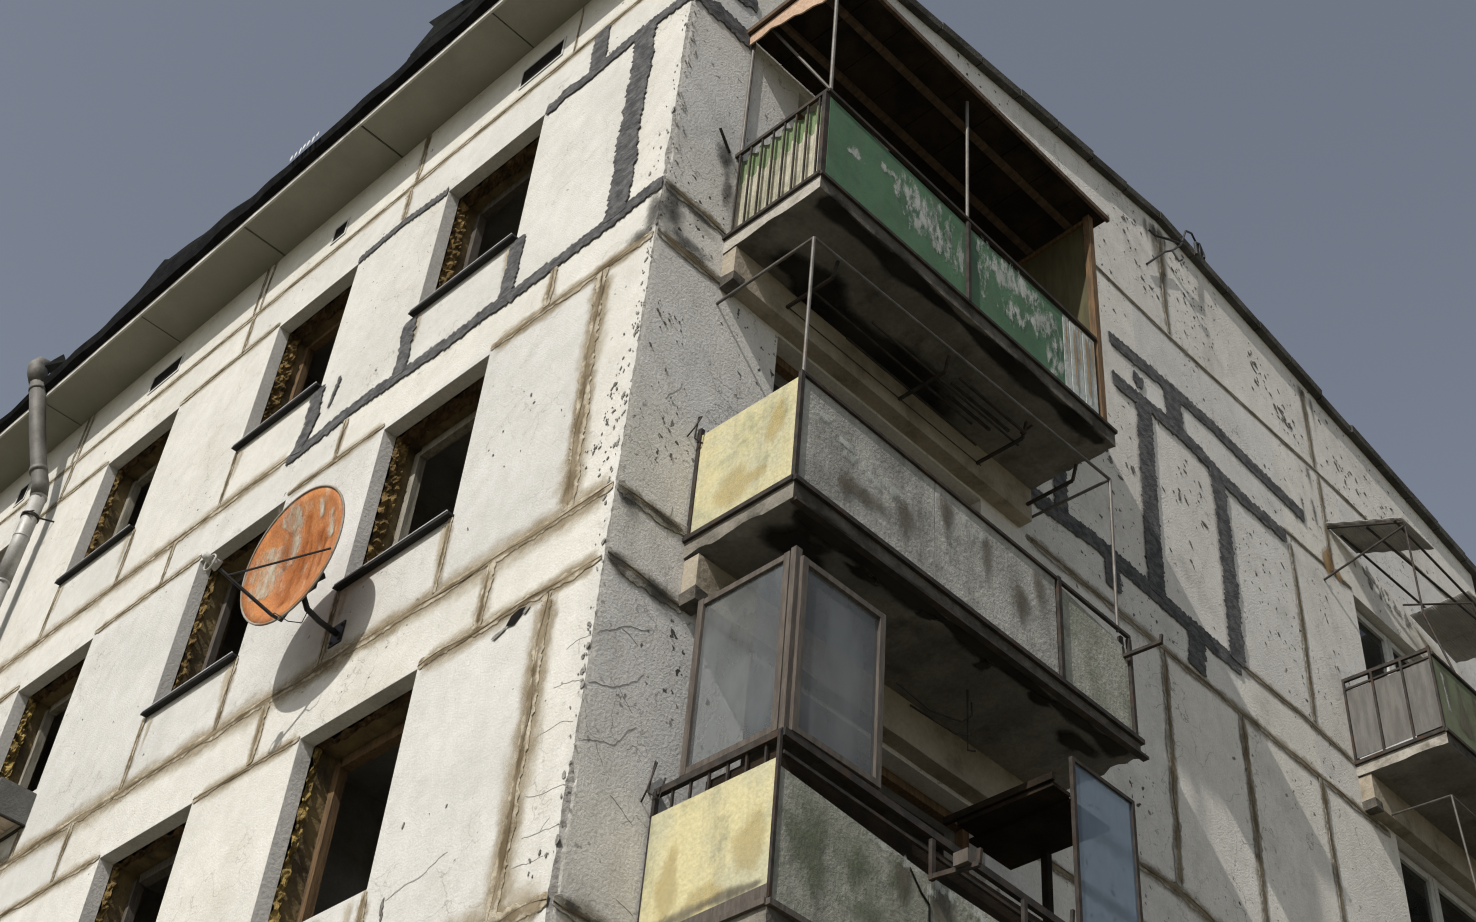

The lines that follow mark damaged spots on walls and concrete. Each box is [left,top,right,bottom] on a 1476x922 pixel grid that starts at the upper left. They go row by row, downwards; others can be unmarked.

leakage [718,145,731,203]
leakage [43,0,643,516]
spalling [1108,192,1218,354]
spalling [1242,350,1303,444]
leakage [0,185,711,922]
crack [0,229,720,922]
spalling [1320,447,1393,519]
leakage [665,880,759,922]